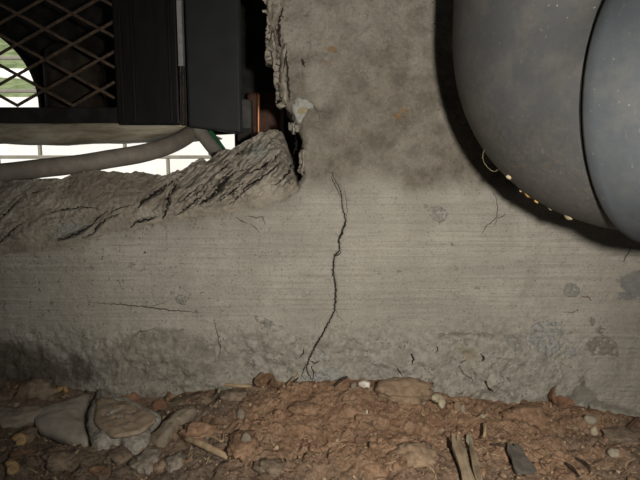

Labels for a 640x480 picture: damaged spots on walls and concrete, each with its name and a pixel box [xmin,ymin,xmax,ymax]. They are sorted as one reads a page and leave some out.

spalling [0,0,313,254]
crack [300,172,348,381]